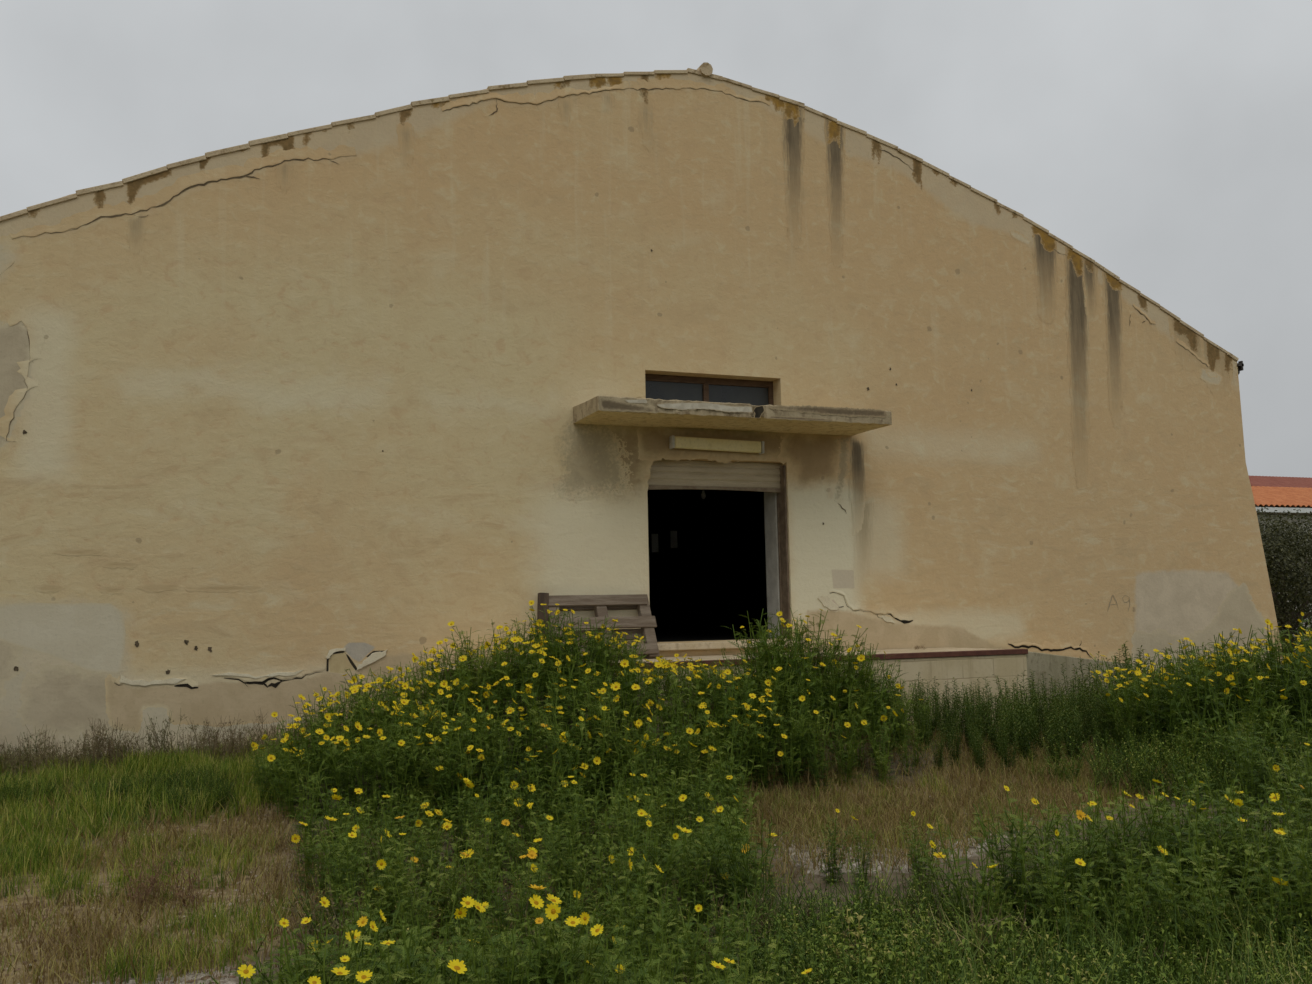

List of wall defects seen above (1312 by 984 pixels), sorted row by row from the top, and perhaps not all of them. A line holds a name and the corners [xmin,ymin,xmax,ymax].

crack [440,78,771,116]
crack [7,145,356,269]
water stain [781,106,805,249]
water stain [824,118,846,268]
crack [0,308,44,441]
water stain [1032,225,1123,490]
spalling [326,642,387,674]
crack [828,587,913,624]
crack [1008,638,1094,657]